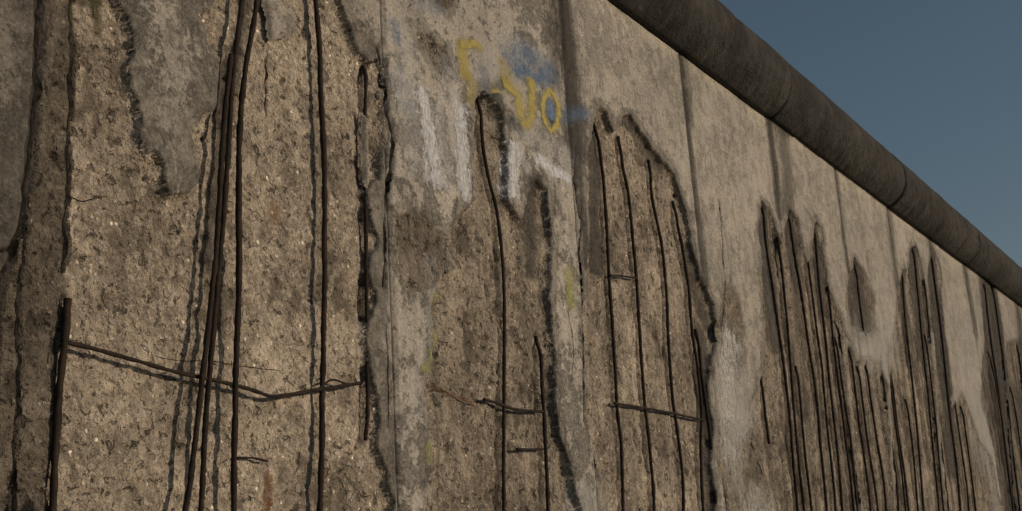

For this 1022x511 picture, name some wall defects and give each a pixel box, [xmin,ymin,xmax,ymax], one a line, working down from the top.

crack [0,0,43,511]
crack [62,0,106,274]
spalling [0,0,395,511]
spalling [394,83,581,511]
damp [524,174,539,277]
damp [678,51,744,511]
spalling [580,109,1022,511]